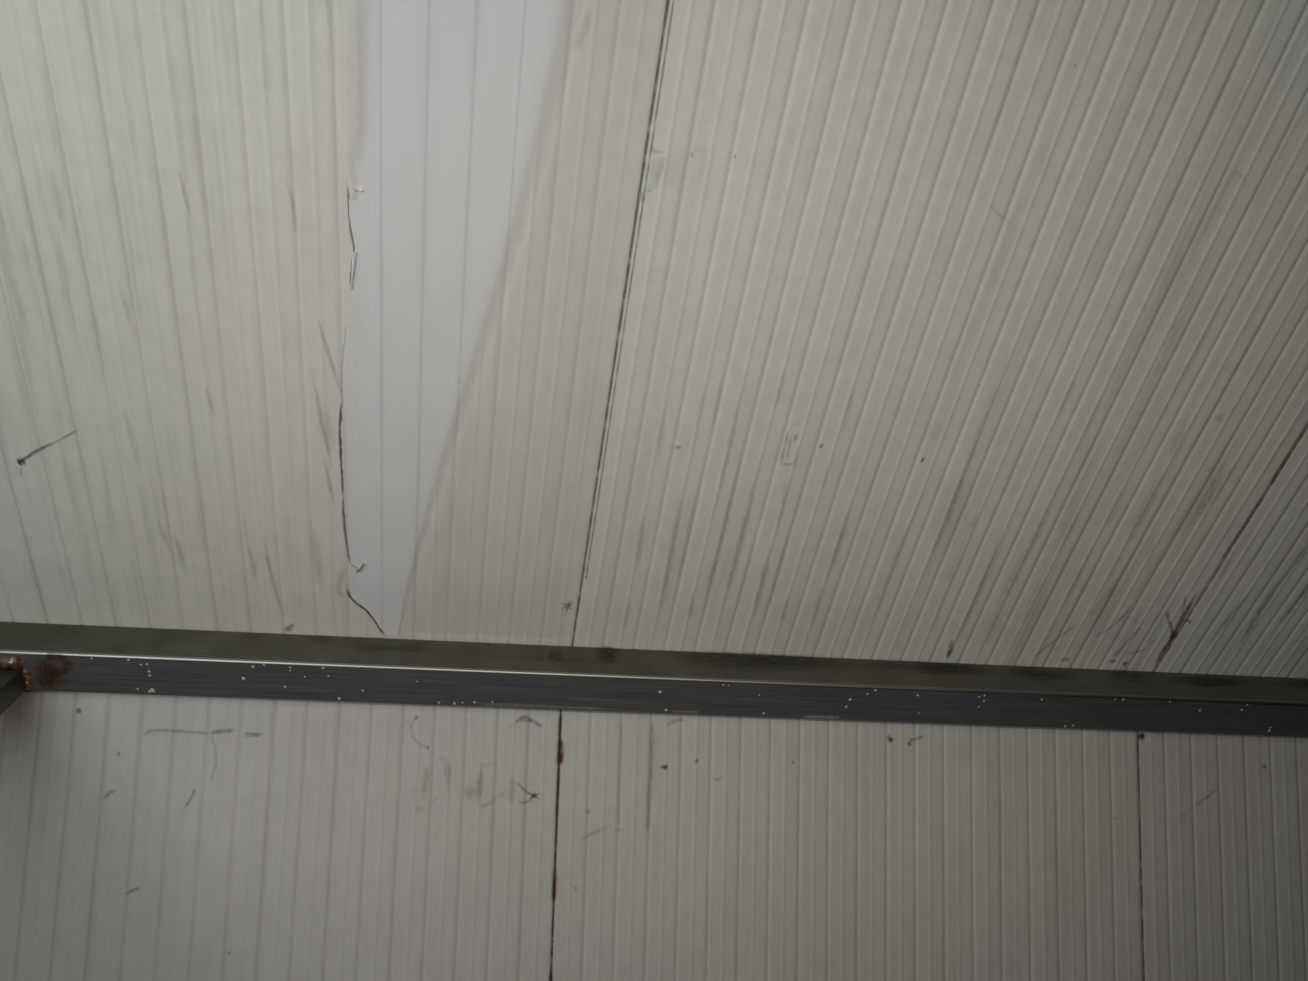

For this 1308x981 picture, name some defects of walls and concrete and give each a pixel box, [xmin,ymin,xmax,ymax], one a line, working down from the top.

peeling [339,0,568,636]